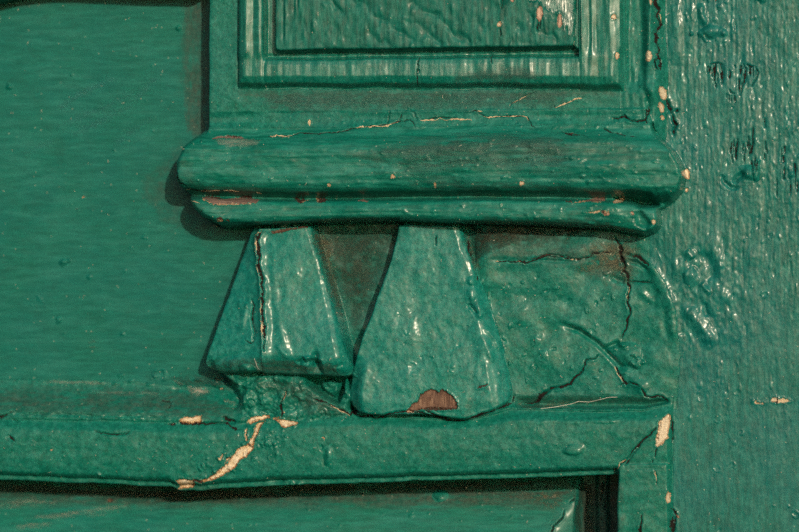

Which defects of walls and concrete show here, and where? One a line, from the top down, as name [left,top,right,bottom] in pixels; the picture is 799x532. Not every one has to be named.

crack [267,92,535,137]
crack [707,63,758,102]
crack [730,119,798,194]
crack [245,229,266,349]
crack [495,238,650,337]
peeling [176,415,298,489]
peeling [407,389,458,413]
peeling [655,414,671,447]